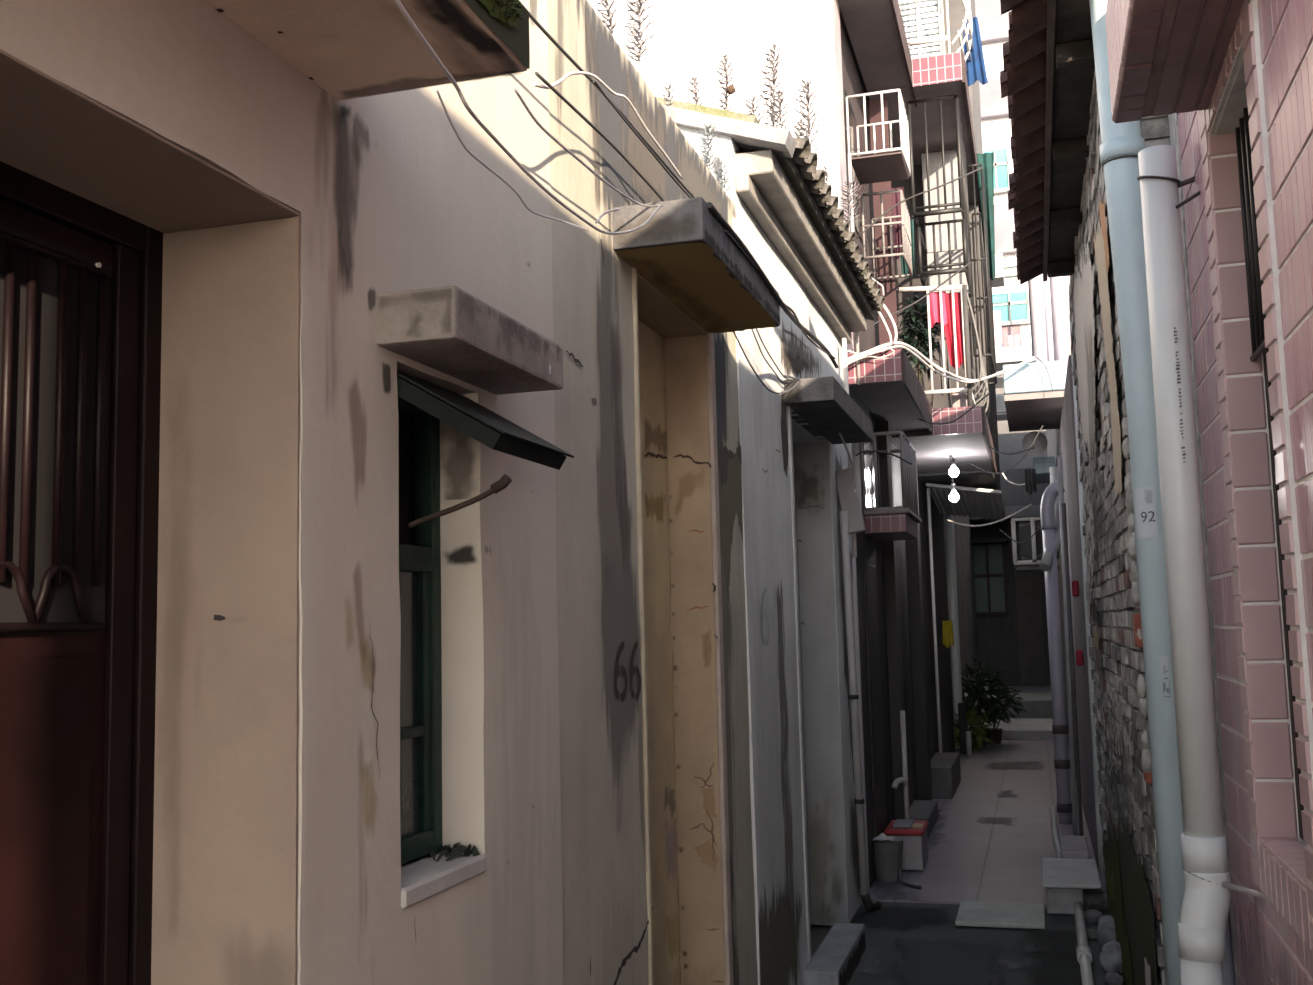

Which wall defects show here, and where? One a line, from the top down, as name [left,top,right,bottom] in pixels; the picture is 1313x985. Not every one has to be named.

damp [335,0,517,285]
crack [644,452,711,469]
damp [577,0,819,775]
crack [590,906,653,985]
crack [689,763,718,862]
damp [759,583,800,985]